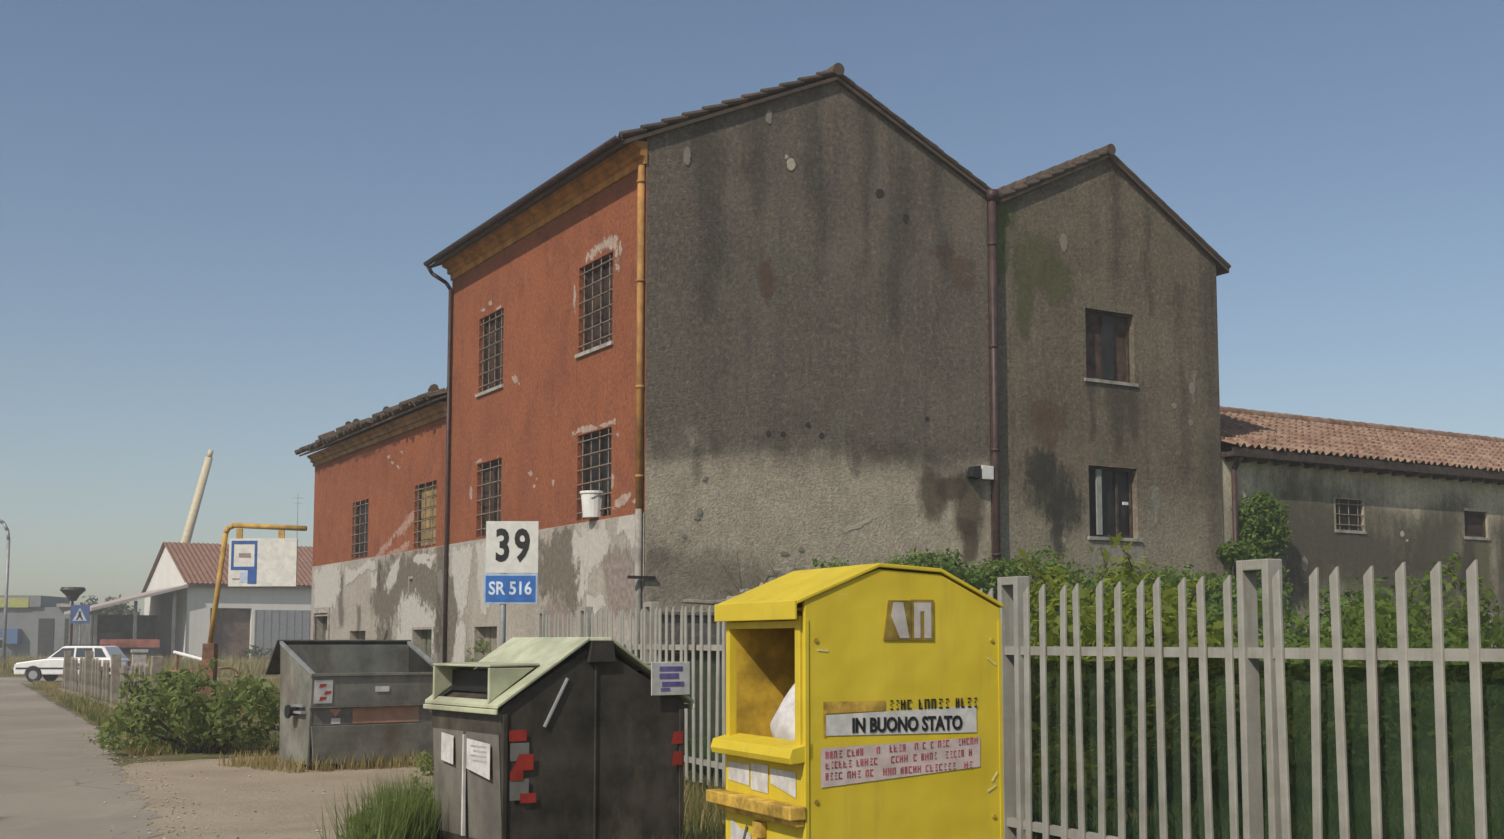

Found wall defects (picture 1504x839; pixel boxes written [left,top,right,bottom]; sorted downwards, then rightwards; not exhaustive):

peeling [583,235,622,272]
water stain [996,216,1031,337]
flaking render [312,510,495,663]
flaking render [538,474,635,637]
water stain [921,472,981,561]
water stain [1027,450,1082,553]
water stain [1276,474,1504,625]